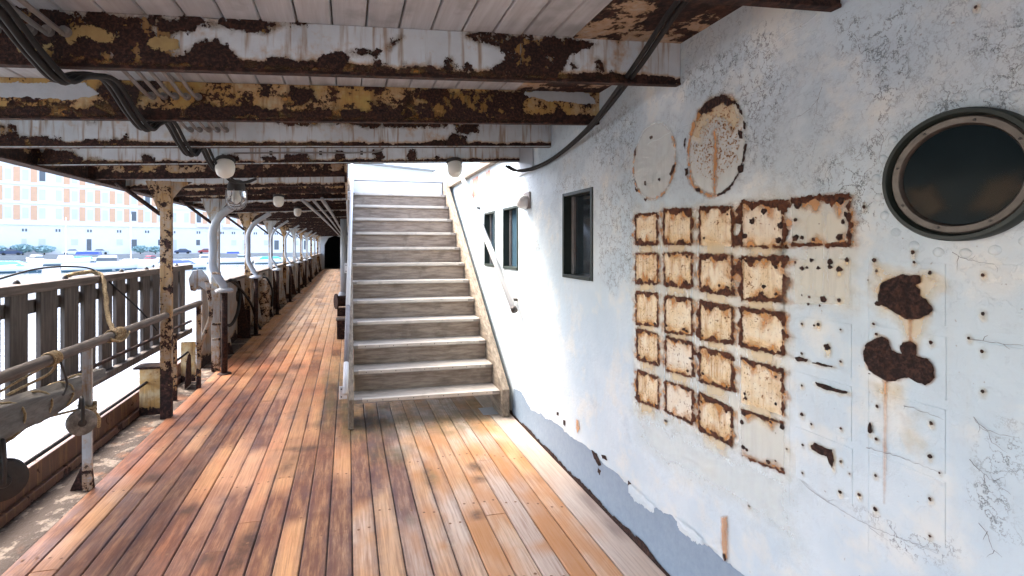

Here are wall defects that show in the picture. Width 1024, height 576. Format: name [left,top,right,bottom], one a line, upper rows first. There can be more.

corrosion [0,6,474,76]
corrosion [466,32,594,78]
corrosion [594,60,618,80]
corrosion [0,80,163,165]
corrosion [184,85,537,163]
corrosion [632,94,747,201]
corrosion [874,274,933,319]
corrosion [863,336,935,394]
peeling [512,389,744,576]
crack [969,417,1011,555]